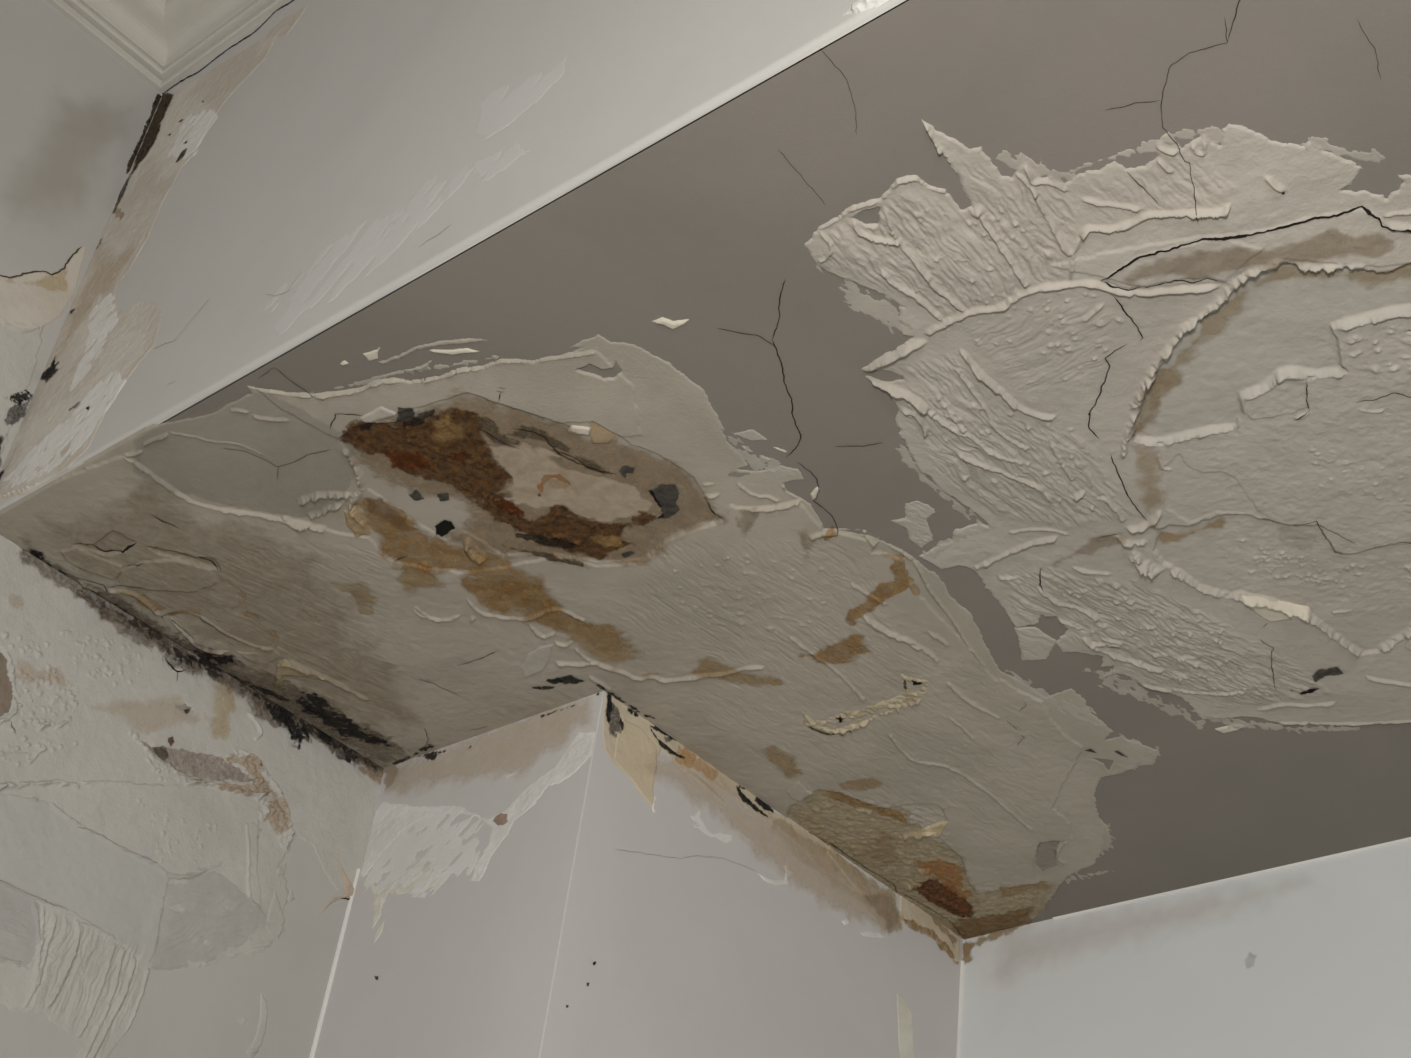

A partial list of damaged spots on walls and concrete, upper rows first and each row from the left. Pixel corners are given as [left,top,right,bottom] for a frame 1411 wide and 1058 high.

crack [0,246,82,278]
peeling [0,5,308,501]
crack [1088,0,1411,538]
water stain [1131,231,1411,283]
peeling [435,520,455,537]
water stain [342,400,721,662]
crack [718,281,838,534]
crack [1263,519,1355,553]
water stain [22,549,582,787]
peeling [321,693,854,945]
water stain [533,675,901,932]
peeling [1291,667,1343,695]